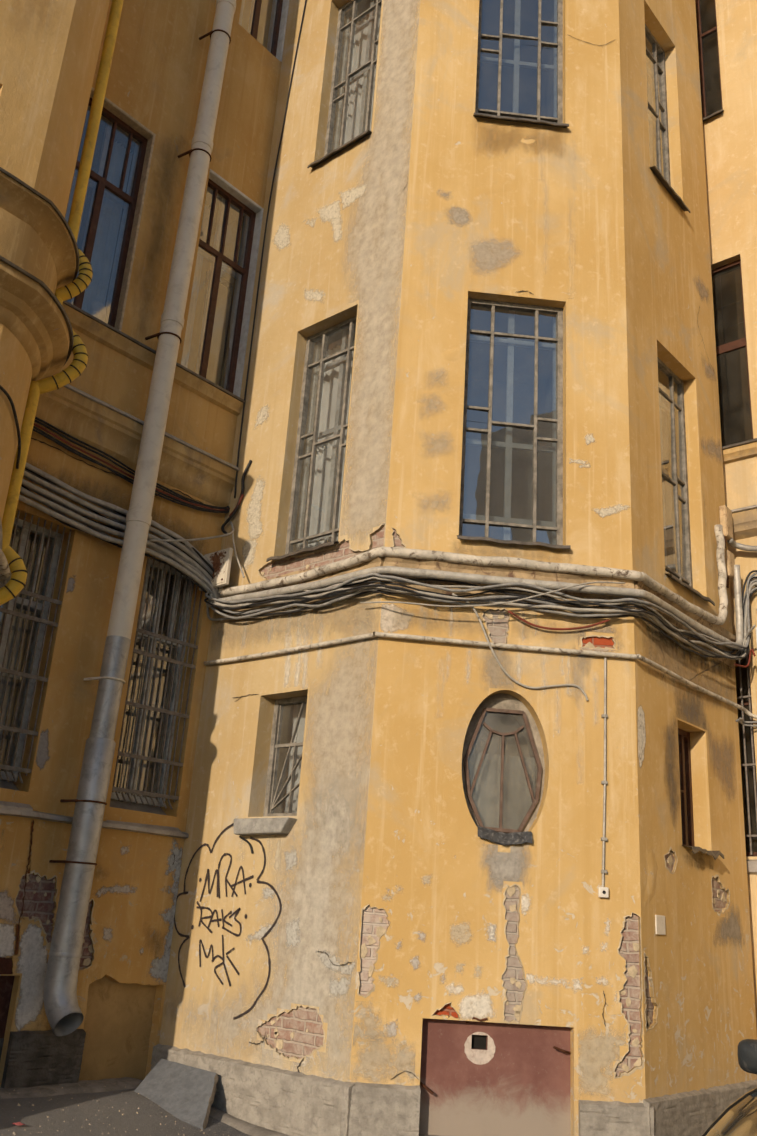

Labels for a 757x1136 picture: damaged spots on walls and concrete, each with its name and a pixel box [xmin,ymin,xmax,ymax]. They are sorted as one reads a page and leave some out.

peeling [274,225,290,249]
peeling [303,184,367,241]
flaking render [243,479,406,580]
flaking render [0,870,58,950]
flaking render [79,884,136,970]
flaking render [319,889,400,998]
flaking render [431,884,582,1024]
flaking render [664,847,678,874]
flaking render [711,875,730,916]
flaking render [255,1005,325,1062]
flaking render [578,912,658,1094]